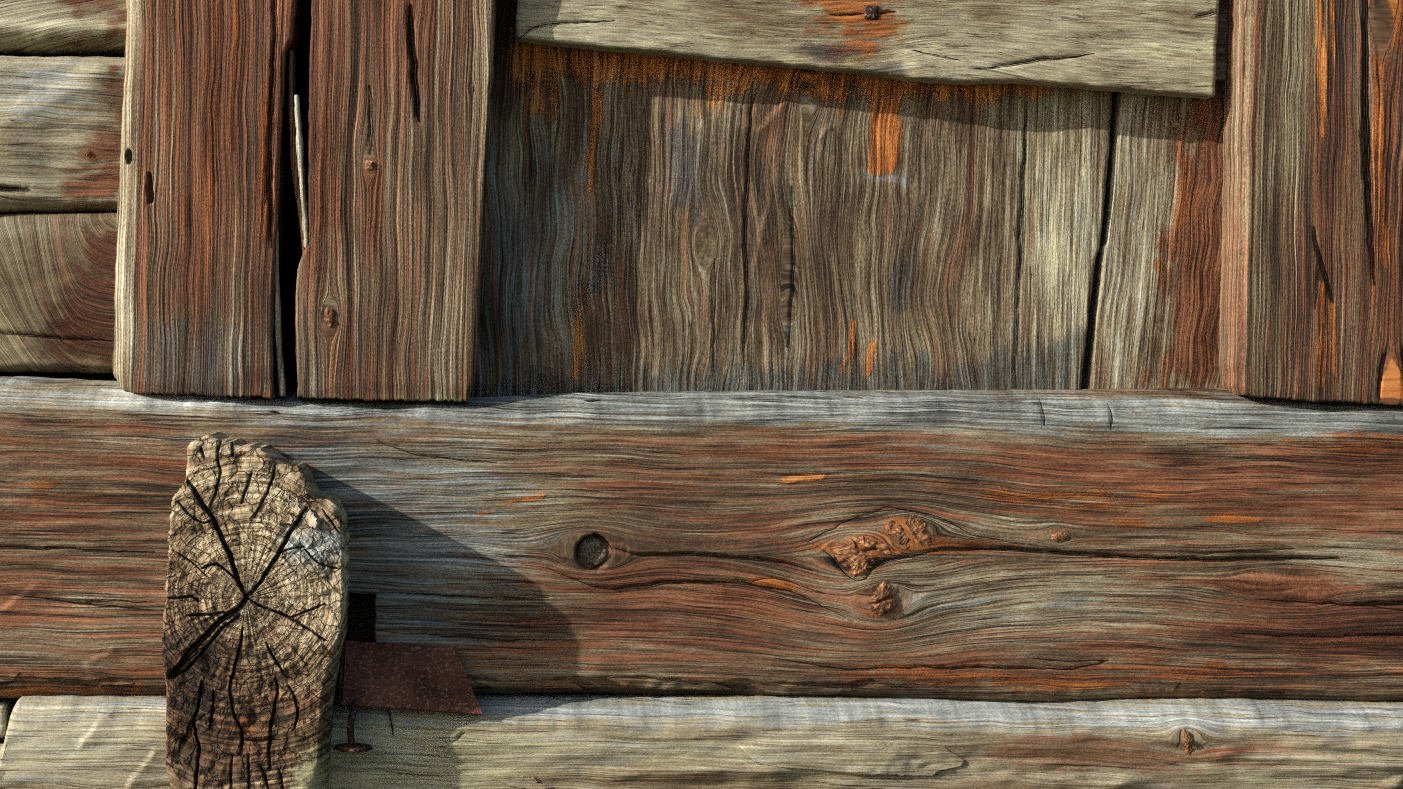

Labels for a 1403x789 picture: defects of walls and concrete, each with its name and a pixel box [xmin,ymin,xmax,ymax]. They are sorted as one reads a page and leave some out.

rust [799,0,907,57]
crack [0,440,341,789]